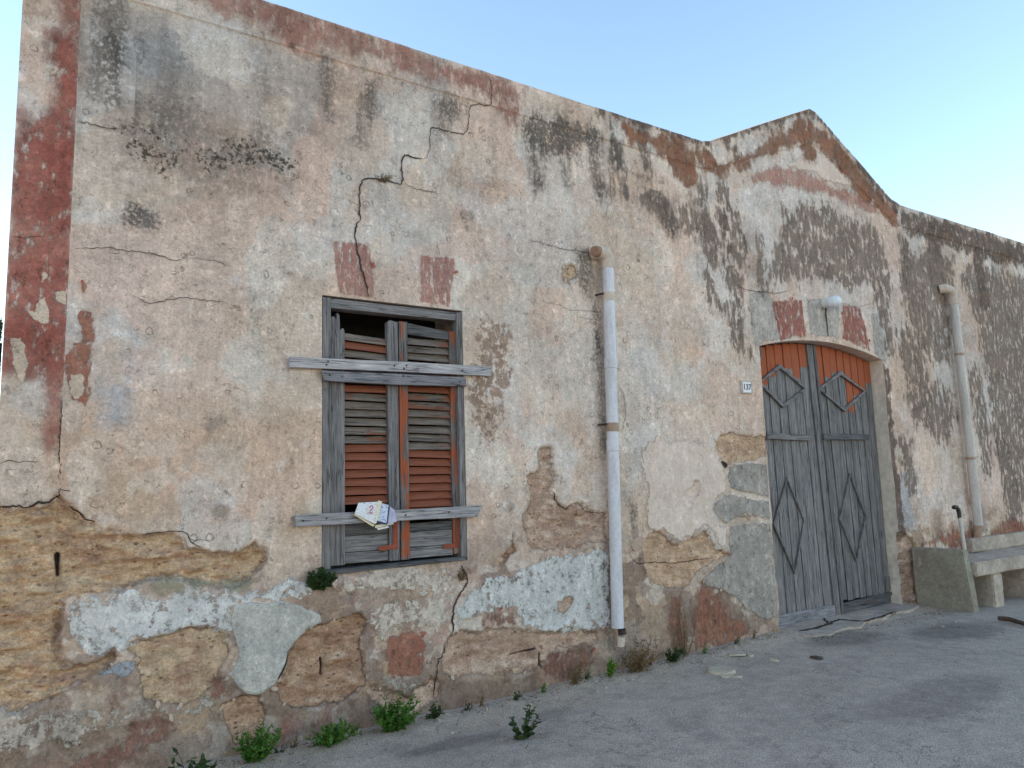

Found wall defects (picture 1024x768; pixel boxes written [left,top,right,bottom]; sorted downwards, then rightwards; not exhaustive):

water stain [90,0,126,100]
peeling [1,0,95,446]
mould [124,205,160,228]
crack [85,247,230,266]
crack [133,295,220,304]
water stain [114,92,299,178]
crack [349,73,493,297]
water stain [524,108,1024,541]
flaking render [0,497,312,768]
peeling [271,447,611,714]
crack [433,565,468,692]
peeling [641,432,766,588]